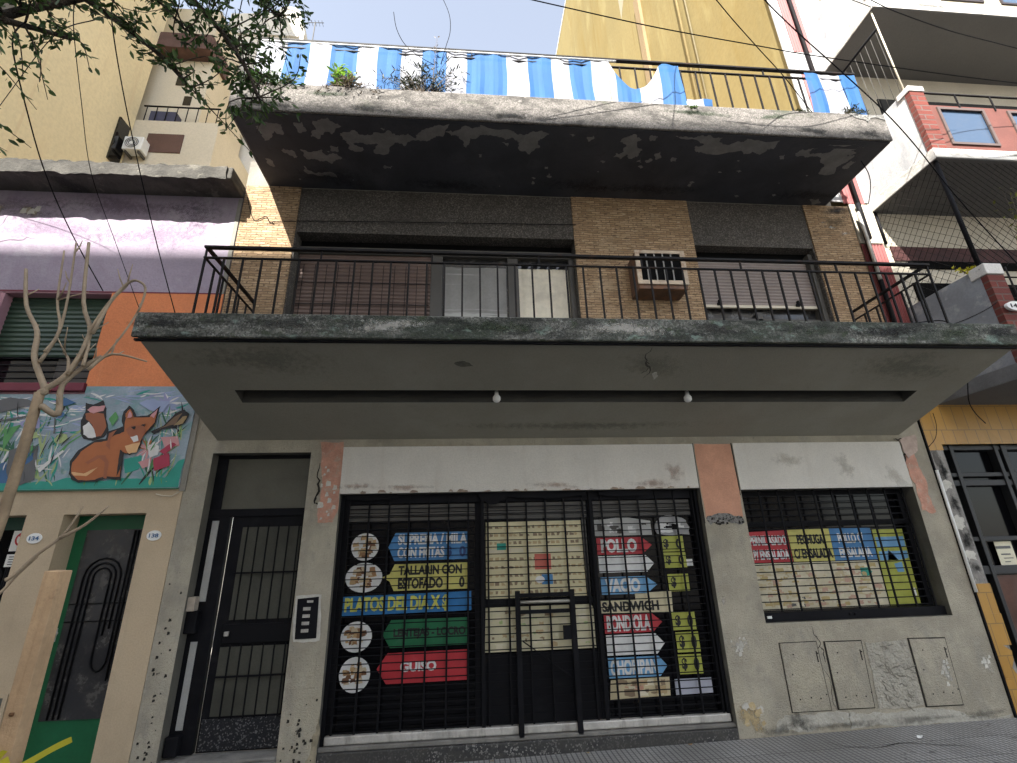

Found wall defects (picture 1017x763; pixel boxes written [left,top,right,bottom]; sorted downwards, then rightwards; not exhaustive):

peeling [256,118,549,180]
peeling [597,134,677,172]
peeling [676,135,864,176]
peeling [317,442,344,523]
peeling [895,435,936,514]